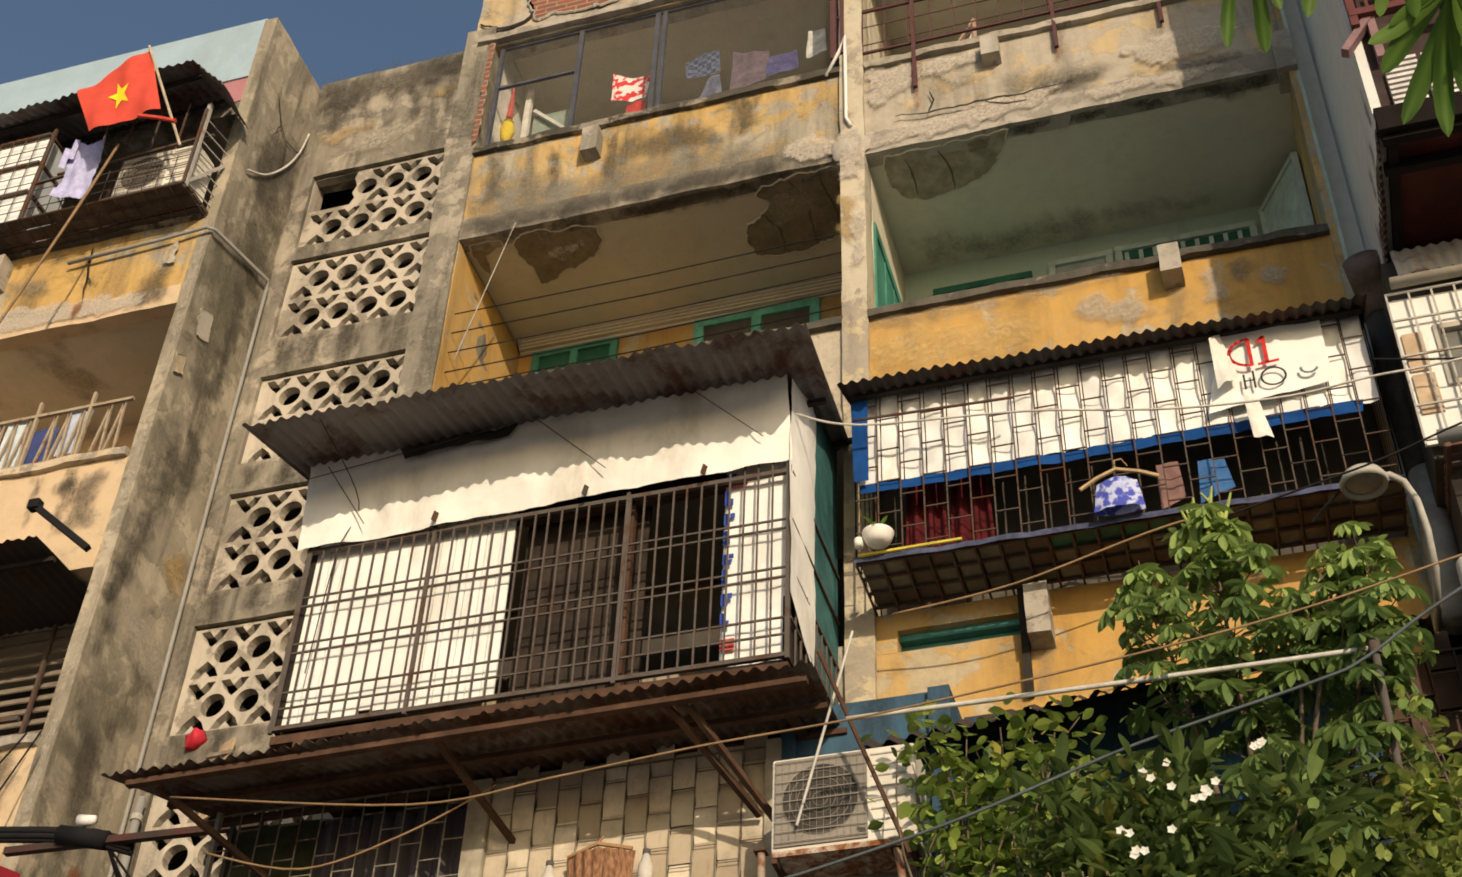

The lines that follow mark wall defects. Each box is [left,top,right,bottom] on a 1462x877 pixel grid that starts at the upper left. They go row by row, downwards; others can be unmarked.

spalling [527,0,618,21]
leakage [470,97,801,230]
spalling [745,85,1058,263]
spalling [469,225,605,285]
leakage [56,471,100,524]
leakage [66,136,299,826]